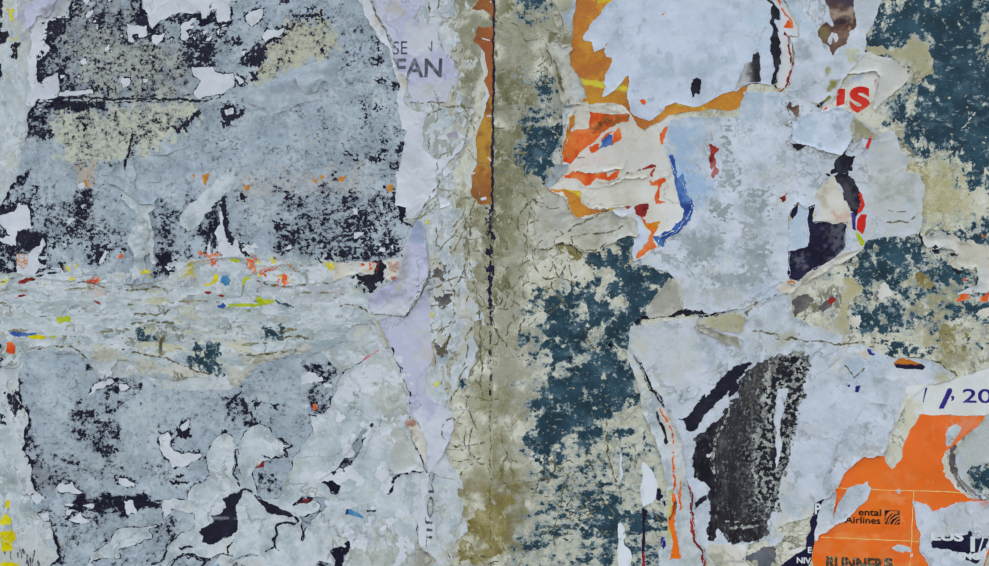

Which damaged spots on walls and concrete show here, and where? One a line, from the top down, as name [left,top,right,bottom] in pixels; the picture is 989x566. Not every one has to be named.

peeling [0,0,21,78]
peeling [104,17,227,54]
peeling [243,8,285,45]
peeling [59,53,95,97]
peeling [191,65,244,99]
peeling [0,200,47,275]
peeling [301,371,332,388]
peeling [760,356,805,467]
peeling [158,419,202,470]
peeling [56,480,95,525]
peeling [118,478,138,515]
peeling [758,478,779,503]